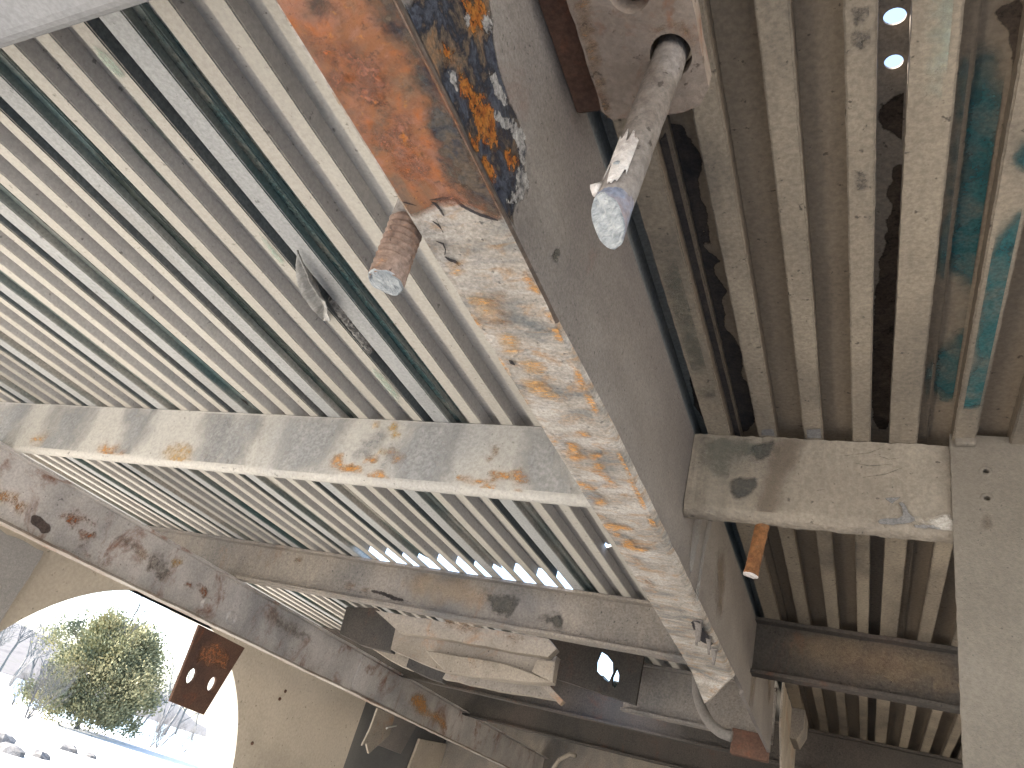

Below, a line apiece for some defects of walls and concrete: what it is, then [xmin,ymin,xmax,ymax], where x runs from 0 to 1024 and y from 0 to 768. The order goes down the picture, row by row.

corrosion [276,0,519,218]
crack [433,219,459,266]
corrosion [331,450,404,478]
corrosion [476,470,528,492]
corrosion [552,431,613,505]
leakage [731,441,797,512]
corrosion [0,492,51,533]
corrosion [62,510,95,539]
leakage [488,595,519,617]
leakage [545,615,562,628]